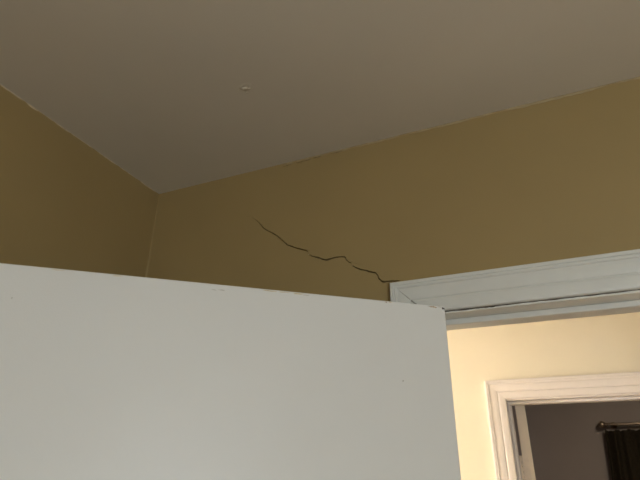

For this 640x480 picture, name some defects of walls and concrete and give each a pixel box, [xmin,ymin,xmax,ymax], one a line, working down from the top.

crack [247,216,416,304]